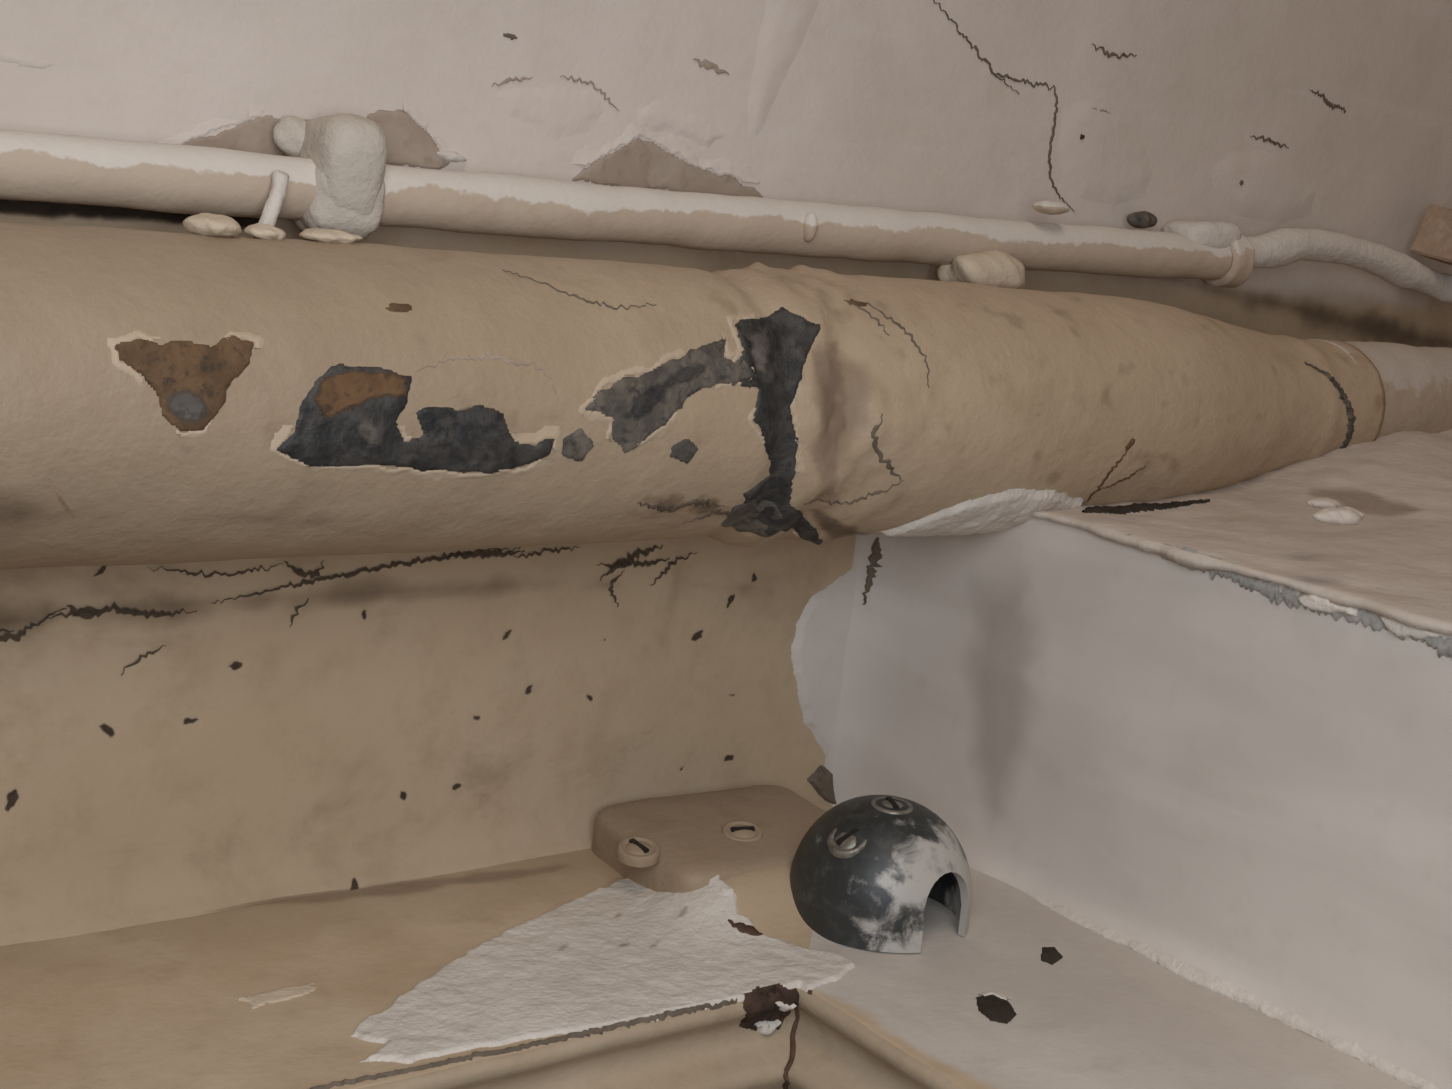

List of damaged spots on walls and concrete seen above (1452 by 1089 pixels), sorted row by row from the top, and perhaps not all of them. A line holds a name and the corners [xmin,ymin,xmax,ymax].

spalling [158,103,287,156]
spalling [367,100,467,170]
spalling [492,75,764,198]
spalling [693,58,729,75]
crack [933,0,1074,211]
rust [107,330,264,437]
peeling [561,307,856,545]
crack [1082,438,1146,504]
peeling [234,982,316,1009]
peeling [350,874,856,1089]
crack [310,999,737,1089]